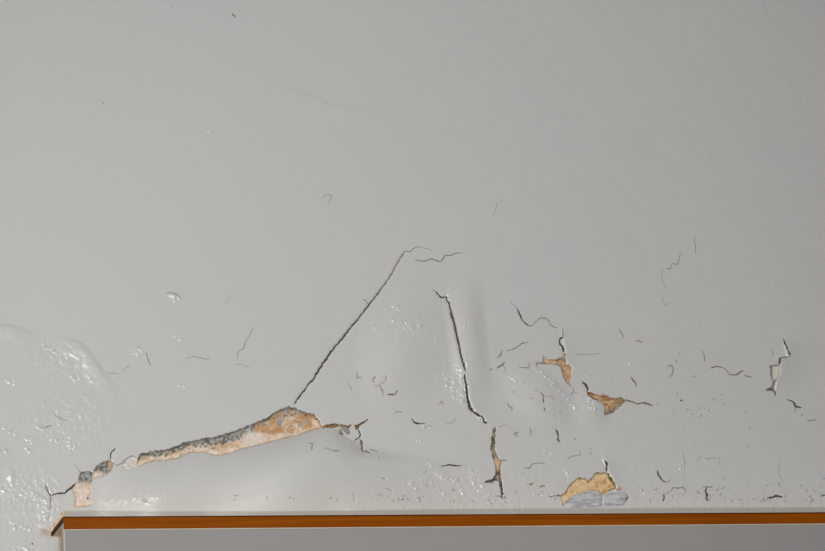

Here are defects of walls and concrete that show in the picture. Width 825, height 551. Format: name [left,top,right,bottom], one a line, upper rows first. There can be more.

crack [294,246,461,404]
crack [490,301,601,372]
flaking render [542,353,572,386]
crack [771,339,791,364]
crack [348,289,544,499]
flaking render [587,390,626,415]
crack [309,419,377,453]
flaking render [43,406,361,551]
flaking render [555,472,644,508]